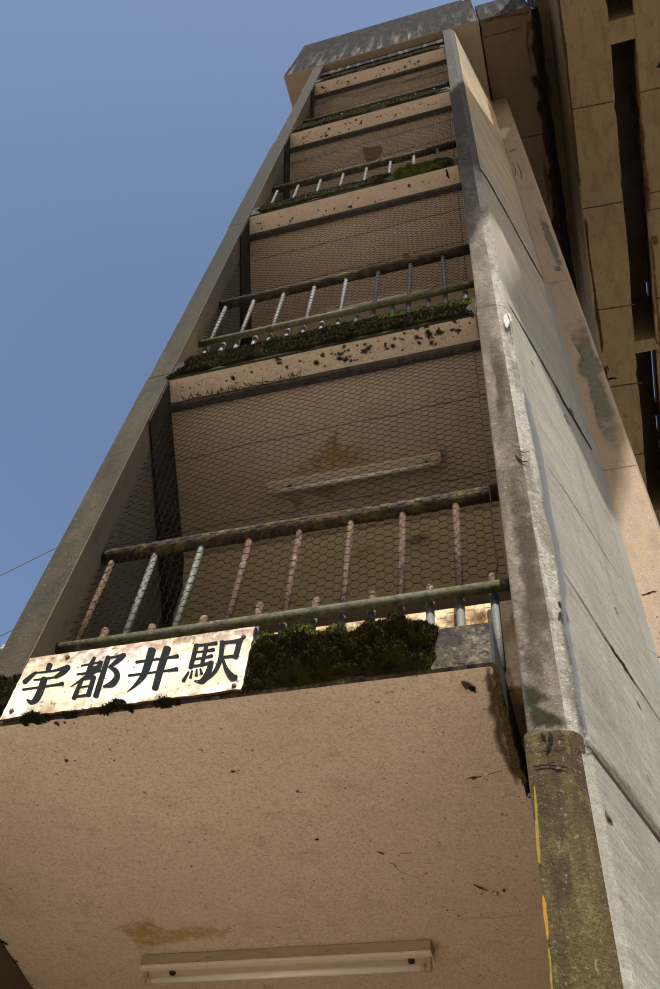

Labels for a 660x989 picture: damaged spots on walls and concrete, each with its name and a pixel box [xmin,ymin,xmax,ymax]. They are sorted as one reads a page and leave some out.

damp [584,219,603,351]
peeling [461,662,528,785]